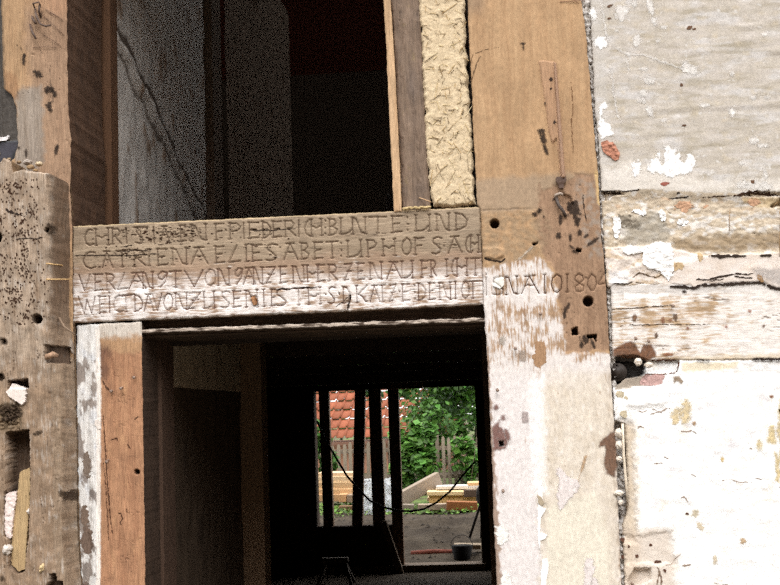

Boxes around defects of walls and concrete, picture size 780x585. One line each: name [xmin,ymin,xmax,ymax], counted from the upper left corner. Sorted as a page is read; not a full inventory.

peeling [594,36,607,49]
peeling [598,101,620,161]
peeling [631,146,696,186]
peeling [737,170,772,206]
peeling [612,209,646,238]
flaking render [658,201,709,226]
peeling [623,241,684,281]
crack [612,254,780,326]
peeling [532,341,546,368]
flaking render [640,374,665,386]
peeling [494,526,509,545]
peeling [501,571,512,585]